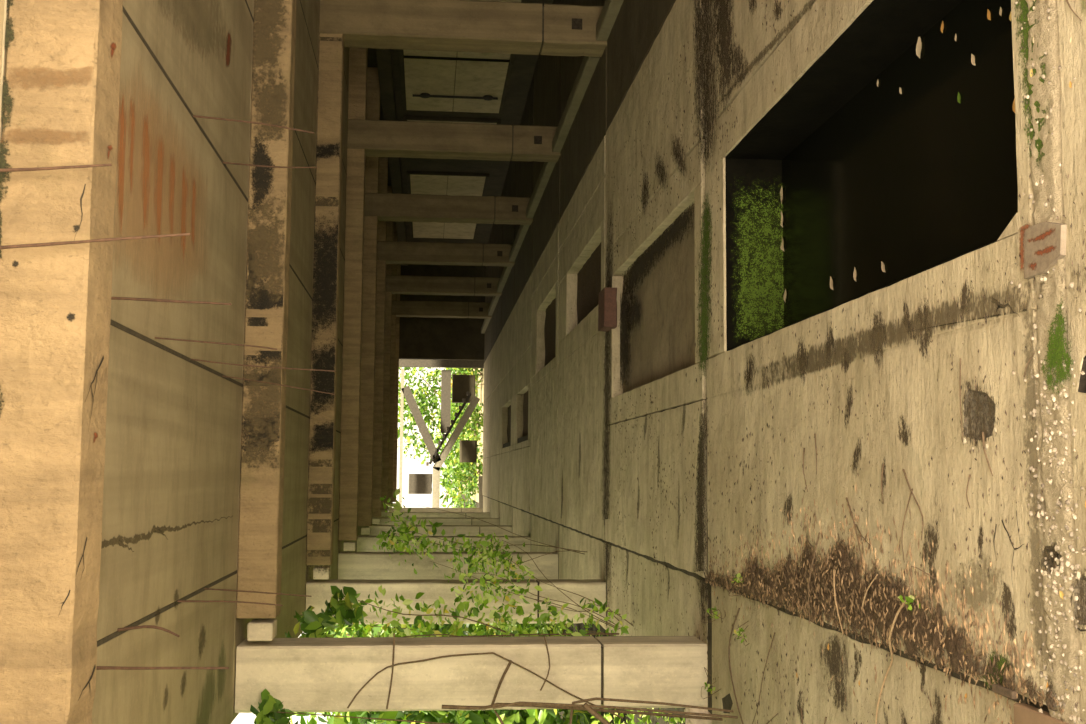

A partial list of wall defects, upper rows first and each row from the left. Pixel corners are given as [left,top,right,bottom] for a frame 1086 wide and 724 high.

damp [641,0,748,215]
damp [246,0,288,326]
corrosion [1019,224,1055,270]
damp [870,310,885,365]
damp [903,298,932,358]
damp [960,280,970,316]
damp [744,355,756,395]
spalling [1074,356,1086,393]
damp [241,345,282,468]
crack [58,516,231,616]
damp [1001,582,1017,641]
spalling [1070,569,1086,629]